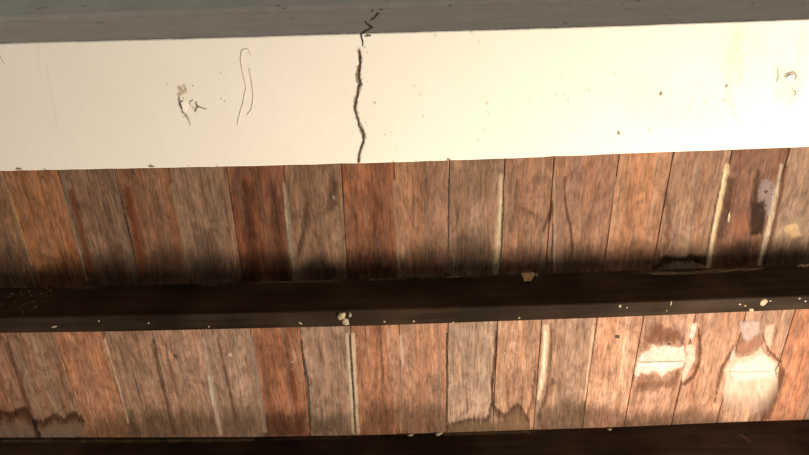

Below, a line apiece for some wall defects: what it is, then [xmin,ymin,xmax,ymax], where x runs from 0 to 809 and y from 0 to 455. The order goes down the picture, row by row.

crack [352,0,388,163]
damp [447,333,530,432]
peeling [635,324,702,389]
peeling [715,321,781,401]
damp [0,408,84,438]